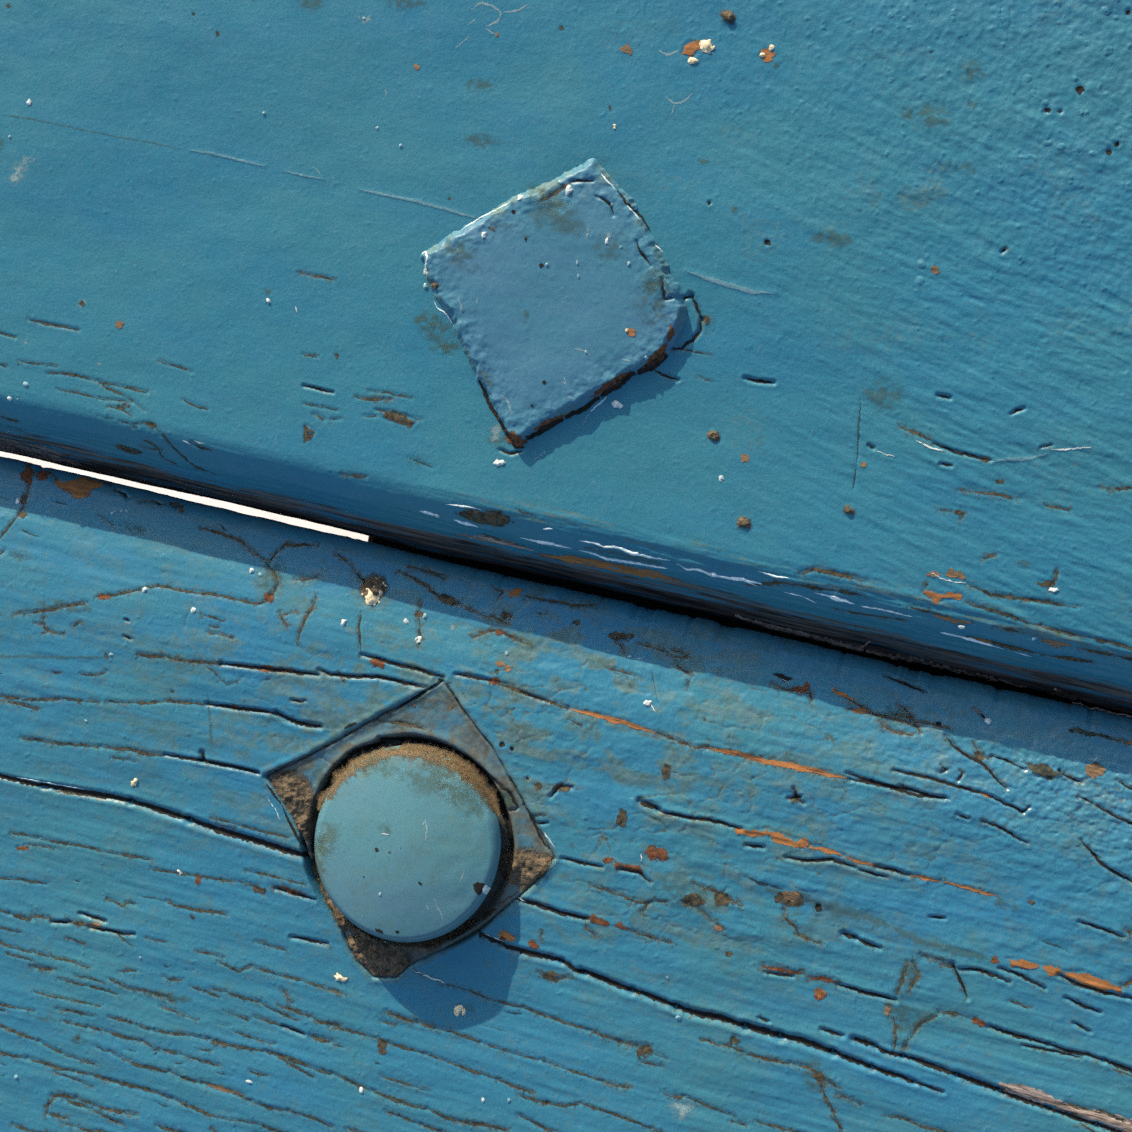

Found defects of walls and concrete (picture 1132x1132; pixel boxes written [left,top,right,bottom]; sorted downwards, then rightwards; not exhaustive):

crack [0,319,215,474]
crack [306,386,336,420]
corrosion [492,426,527,455]
peeling [35,470,128,499]
crack [0,524,1132,1132]
peeling [735,827,996,896]